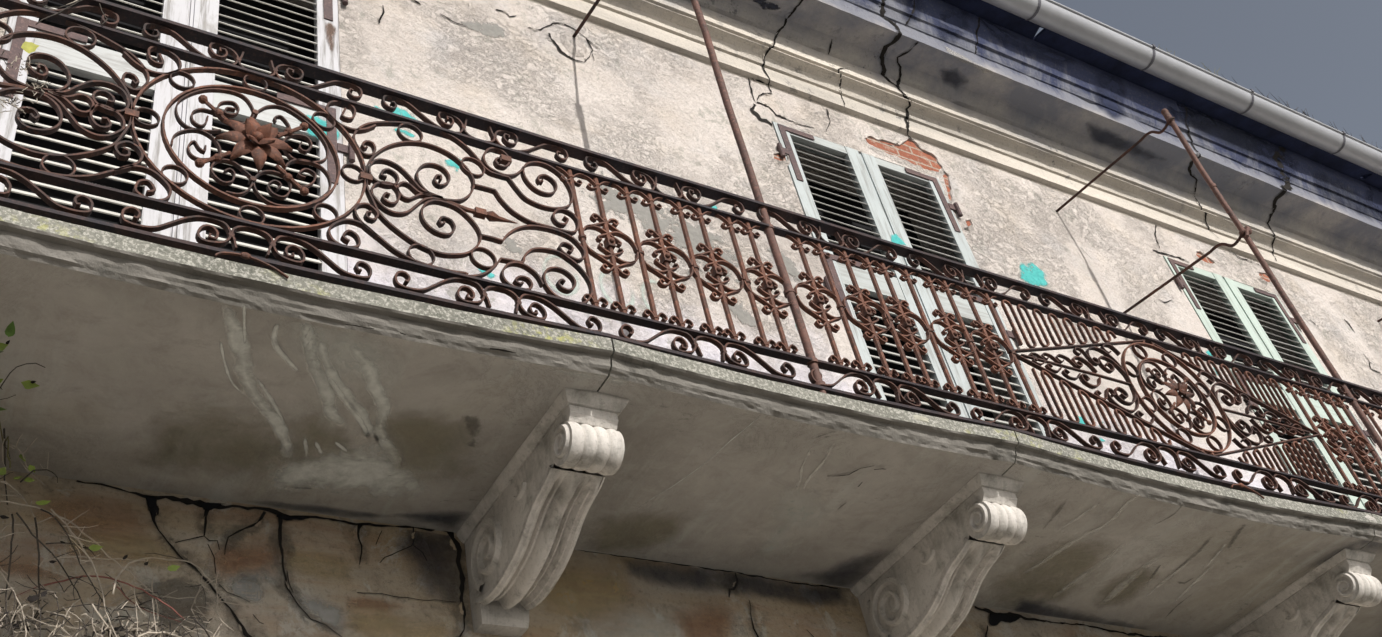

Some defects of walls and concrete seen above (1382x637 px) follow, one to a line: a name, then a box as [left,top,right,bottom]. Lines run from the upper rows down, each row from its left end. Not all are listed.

crack [377,0,465,26]
flaking render [461,19,505,37]
crack [496,9,601,62]
crack [748,0,845,131]
crack [878,0,919,147]
flaking render [860,135,975,232]
damp [1090,127,1141,153]
crack [1185,107,1293,266]
crack [1153,225,1188,262]
damp [220,306,417,495]
crack [76,480,466,637]